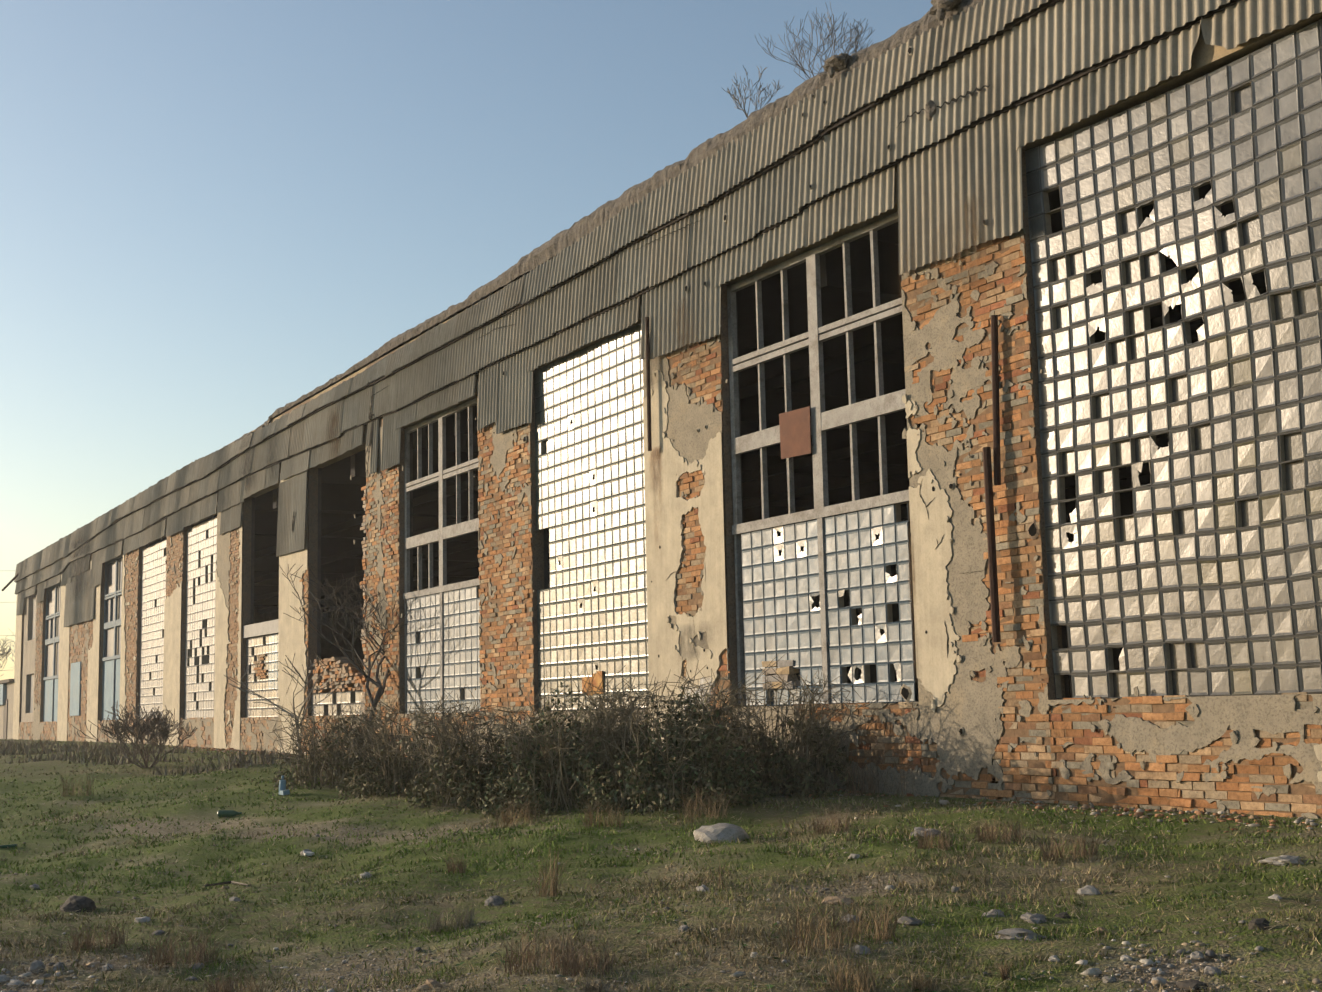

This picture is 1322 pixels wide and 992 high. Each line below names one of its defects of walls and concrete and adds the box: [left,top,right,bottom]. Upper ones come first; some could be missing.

peeling [632,328,734,730]
corrosion [779,406,811,459]
flaking render [794,177,1322,818]